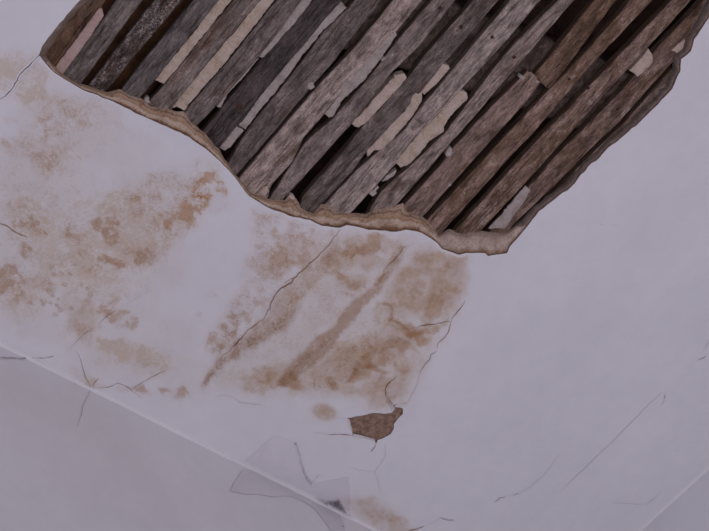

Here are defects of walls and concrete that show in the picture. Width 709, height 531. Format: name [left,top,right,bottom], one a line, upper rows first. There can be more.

crack [0,53,41,101]
spalling [39,0,709,255]
crack [71,289,166,426]
crack [221,230,340,357]
spalling [348,376,407,443]
crack [407,302,465,404]